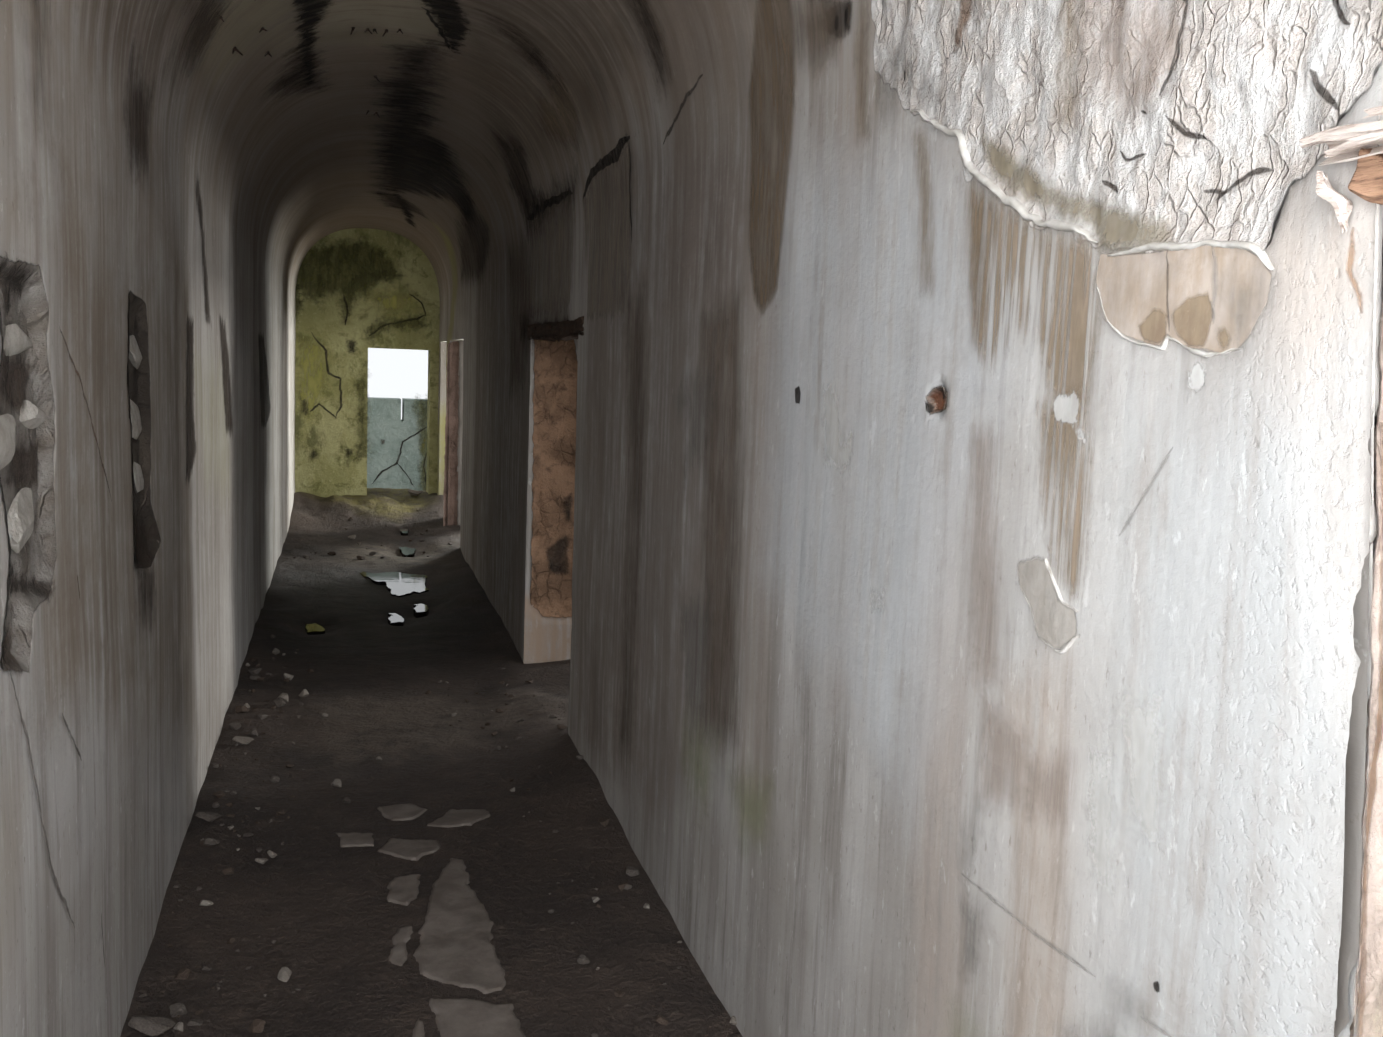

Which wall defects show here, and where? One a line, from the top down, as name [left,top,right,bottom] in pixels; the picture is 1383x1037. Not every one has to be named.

leakage [749,0,793,310]
spalling [826,0,851,38]
spalling [871,0,1383,390]
spalling [0,256,57,672]
spalling [127,291,161,615]
crack [310,294,426,418]
crack [372,427,427,485]
flaking render [530,339,578,618]
corrosion [933,391,946,410]
peeling [1018,558,1081,654]
flaking render [1350,314,1383,1037]